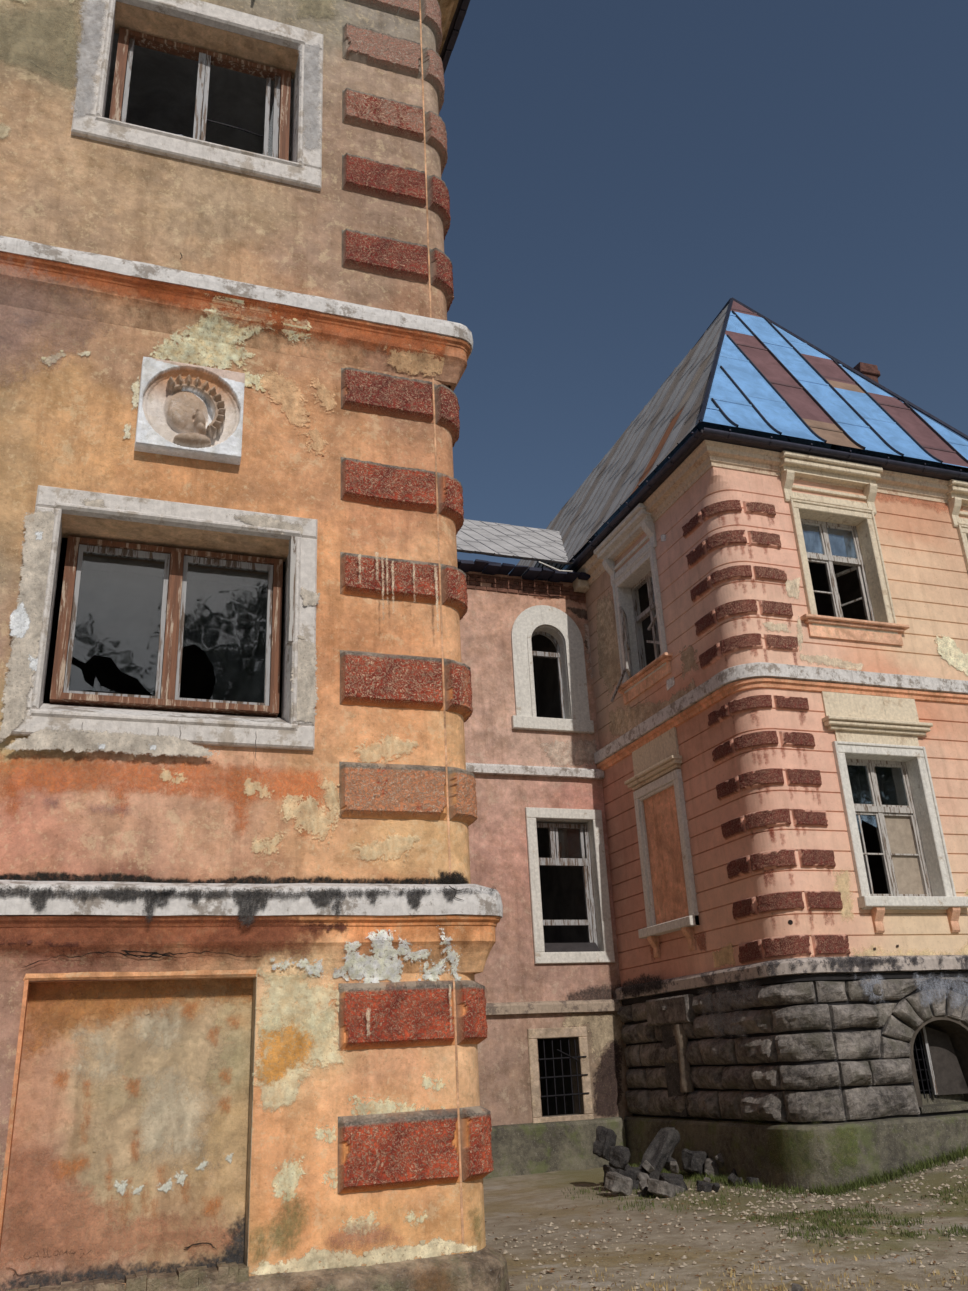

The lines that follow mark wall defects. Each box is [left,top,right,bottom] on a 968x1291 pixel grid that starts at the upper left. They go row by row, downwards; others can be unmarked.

peeling [63,0,106,117]
peeling [299,44,321,149]
peeling [150,293,339,456]
peeling [384,343,445,377]
peeling [934,634,968,676]
damp [0,871,496,957]
peeling [253,922,462,1116]
peeling [314,1124,337,1147]
damp [1,1149,302,1290]
peeling [271,1156,306,1203]
peeling [322,1168,338,1194]
peeling [250,1210,478,1276]